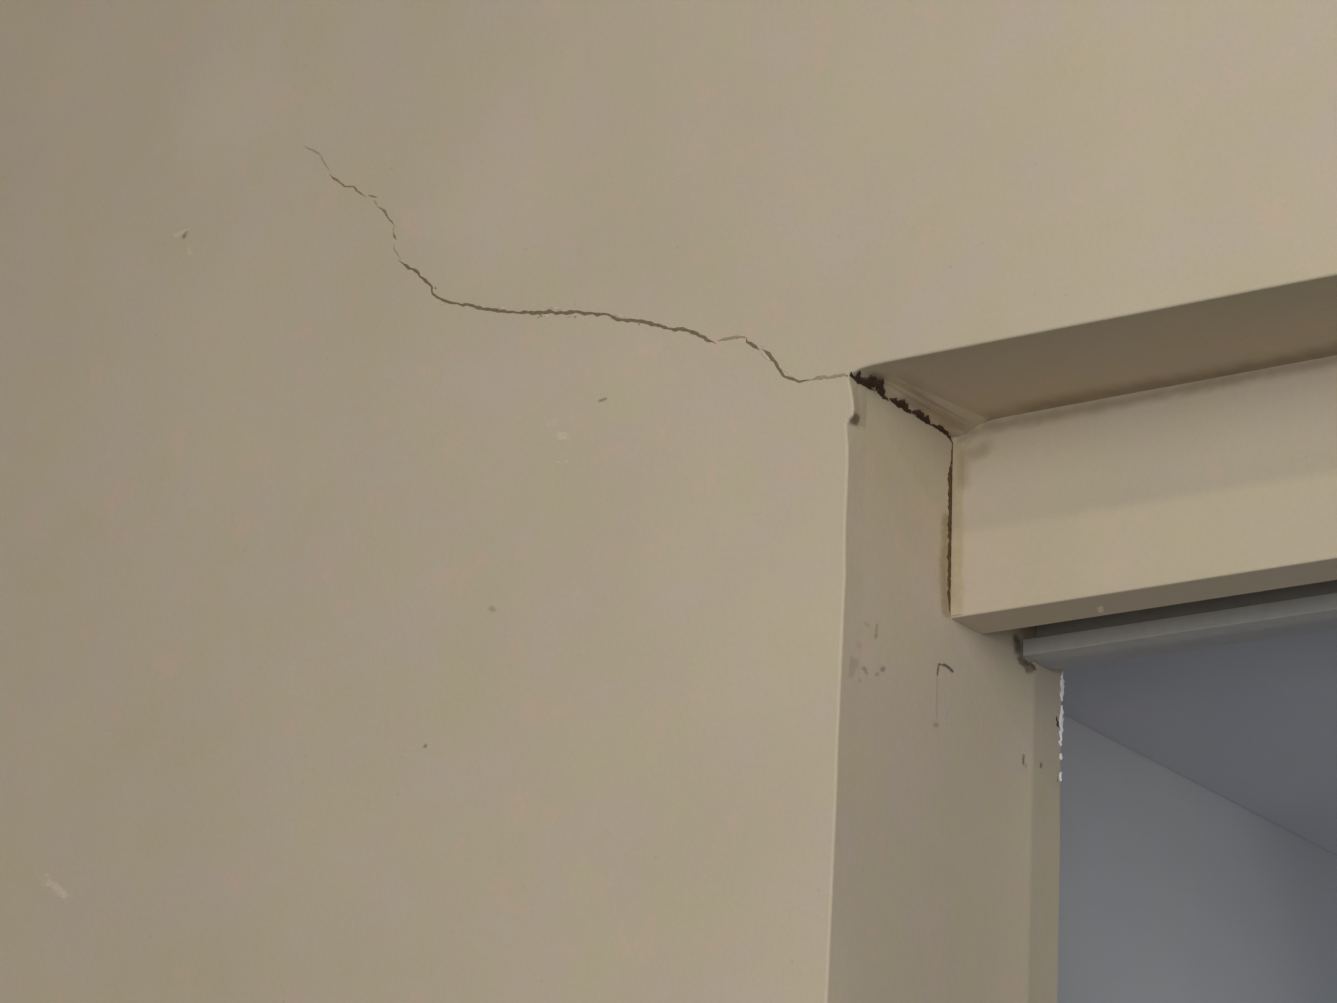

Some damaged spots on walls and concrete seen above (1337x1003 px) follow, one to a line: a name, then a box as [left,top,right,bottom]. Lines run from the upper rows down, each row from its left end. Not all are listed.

crack [305,146,953,613]